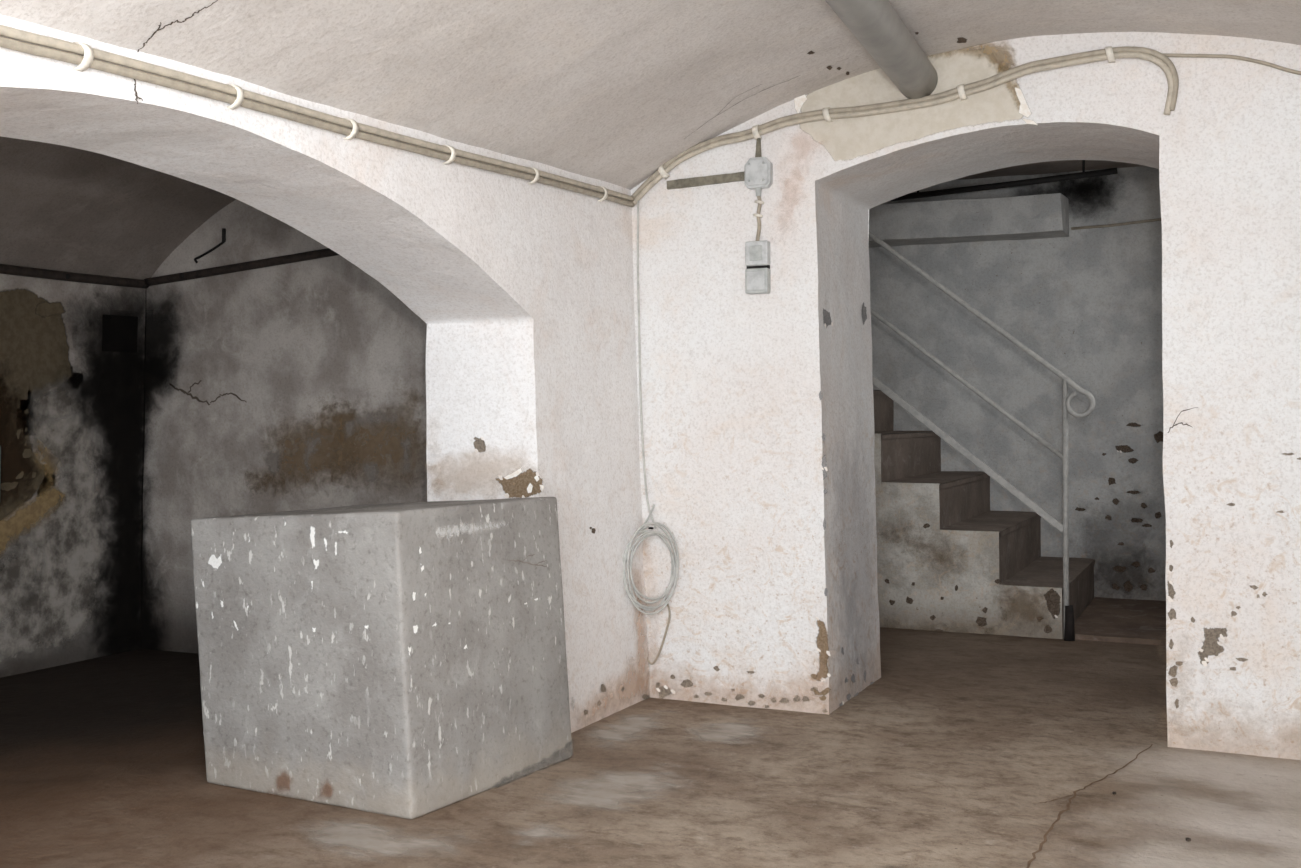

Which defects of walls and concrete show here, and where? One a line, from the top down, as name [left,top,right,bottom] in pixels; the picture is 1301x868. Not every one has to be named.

crack [134,0,218,104]
flaking render [0,289,72,520]
leakage [0,300,180,662]
crack [169,380,246,405]
flaking render [496,468,544,498]
peeling [1075,478,1161,527]
peeling [1102,445,1138,464]
crack [1027,744,1153,868]